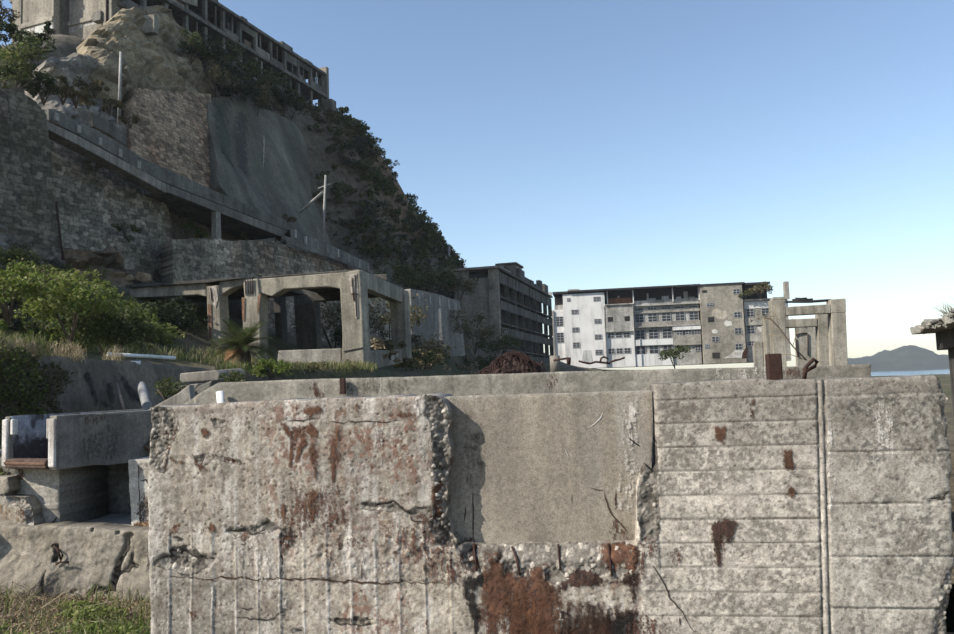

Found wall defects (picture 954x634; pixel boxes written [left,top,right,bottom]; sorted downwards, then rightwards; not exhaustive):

spalling [149,406,179,473]
rust [714,426,726,444]
rust [783,449,794,471]
spalling [51,544,69,566]
spalling [145,536,214,576]
crack [71,465,457,595]
crack [363,494,474,550]
rust [276,384,684,634]
spalling [362,394,661,585]
rust [711,519,737,567]
crack [237,608,283,621]